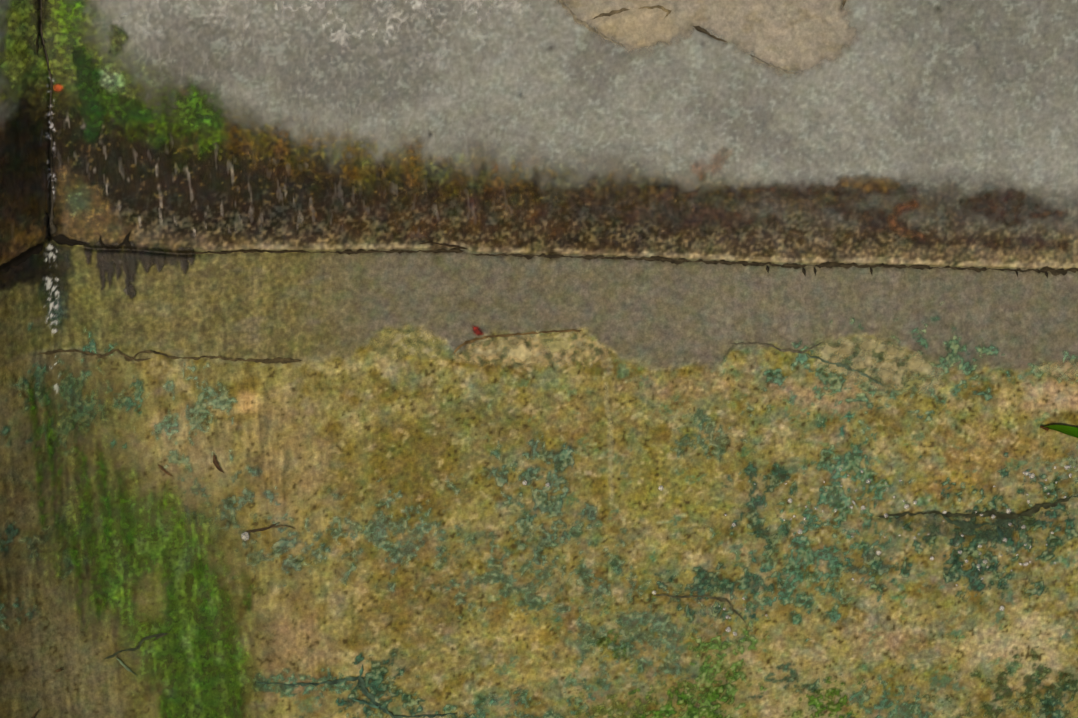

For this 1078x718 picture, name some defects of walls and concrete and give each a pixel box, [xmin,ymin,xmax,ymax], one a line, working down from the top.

spalling [558,0,856,74]
crack [0,0,90,272]
water stain [0,71,1069,333]
crack [189,241,1078,278]
crack [35,349,302,364]
crack [874,496,1077,544]